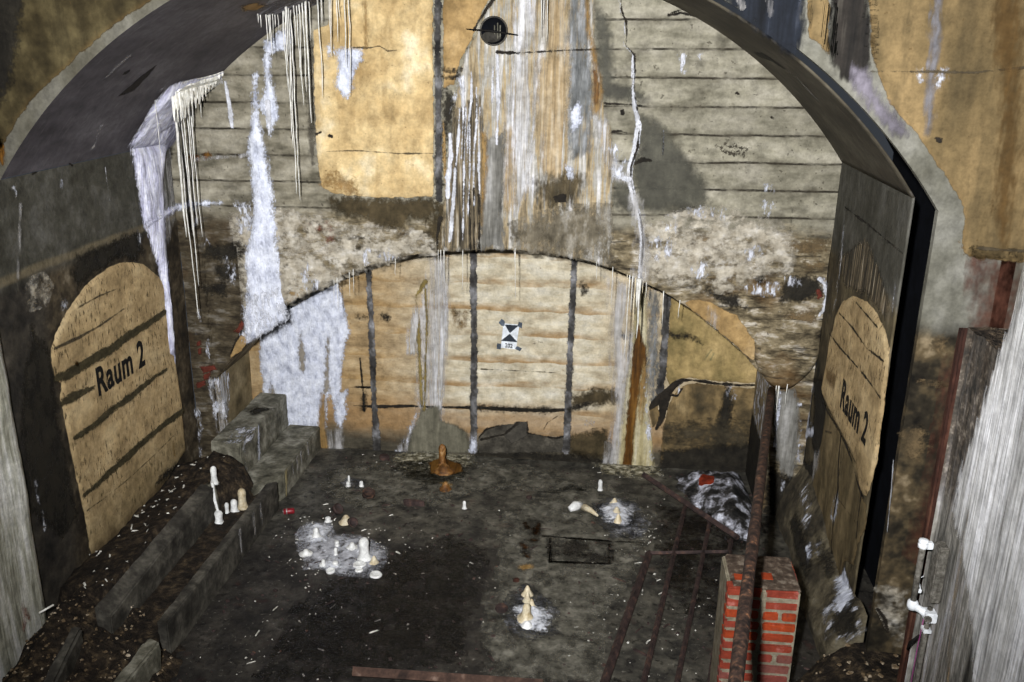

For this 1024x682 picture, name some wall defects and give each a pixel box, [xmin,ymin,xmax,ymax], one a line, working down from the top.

leakage [119,66,155,96]
efflorescence [175,28,438,449]
leakage [503,0,645,211]
crack [603,5,652,278]
leakage [613,116,799,295]
corrosion [623,325,647,466]
crack [649,378,755,430]